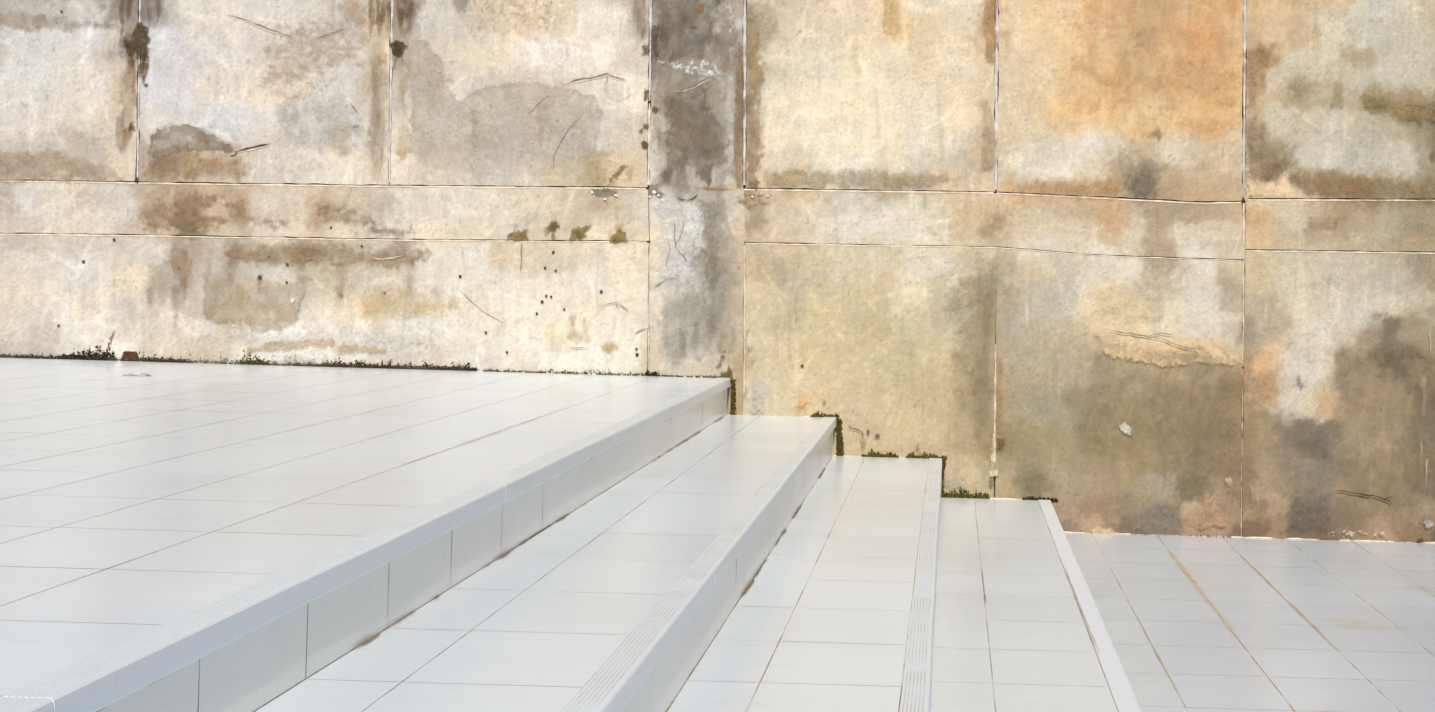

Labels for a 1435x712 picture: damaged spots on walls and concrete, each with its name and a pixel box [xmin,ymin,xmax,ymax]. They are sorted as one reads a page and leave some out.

leakage [120,113,134,149]
leakage [135,125,244,230]
leakage [634,0,948,380]